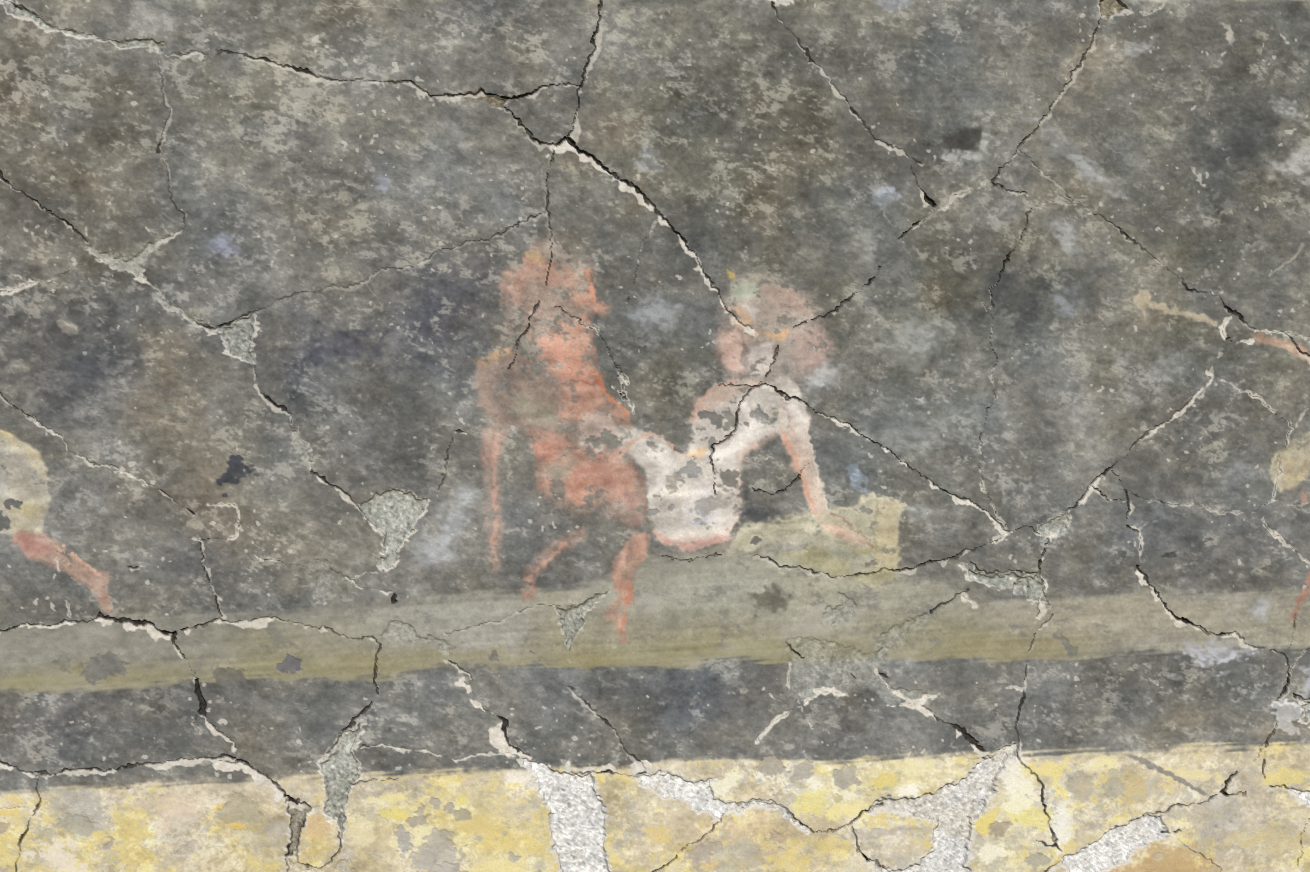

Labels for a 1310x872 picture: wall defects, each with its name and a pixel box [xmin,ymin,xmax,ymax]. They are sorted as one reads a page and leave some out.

crack [0,0,48,21]
crack [0,171,104,297]
crack [154,0,756,415]
crack [250,361,294,432]
crack [709,0,1310,872]
spalling [357,489,431,573]
crack [661,553,722,564]
crack [0,391,653,872]
spalling [517,758,610,872]
crack [654,798,885,872]
spalling [851,740,1024,872]
spalling [1286,787,1310,808]